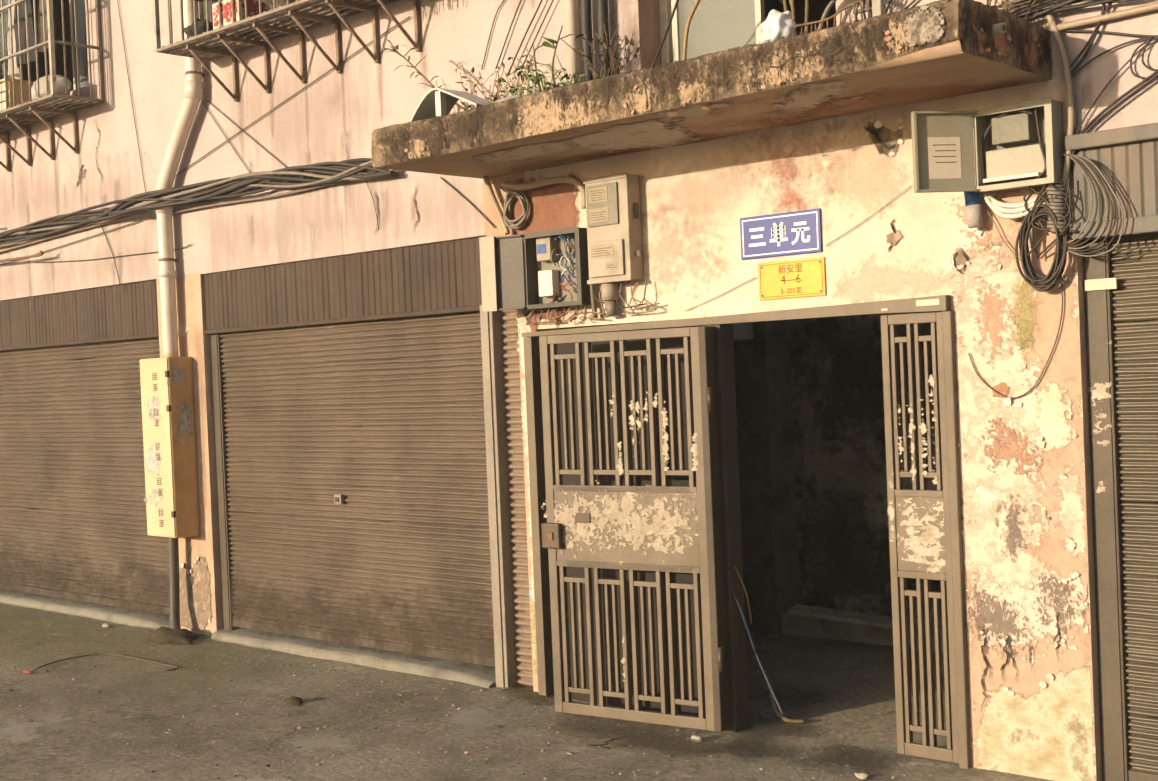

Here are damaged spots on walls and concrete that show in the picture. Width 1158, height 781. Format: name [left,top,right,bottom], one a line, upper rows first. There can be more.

damp [546,12,898,120]
damp [960,0,1052,72]
peeling [845,264,934,303]
peeling [945,192,1094,781]
spalling [179,556,213,631]
crack [981,612,1061,712]